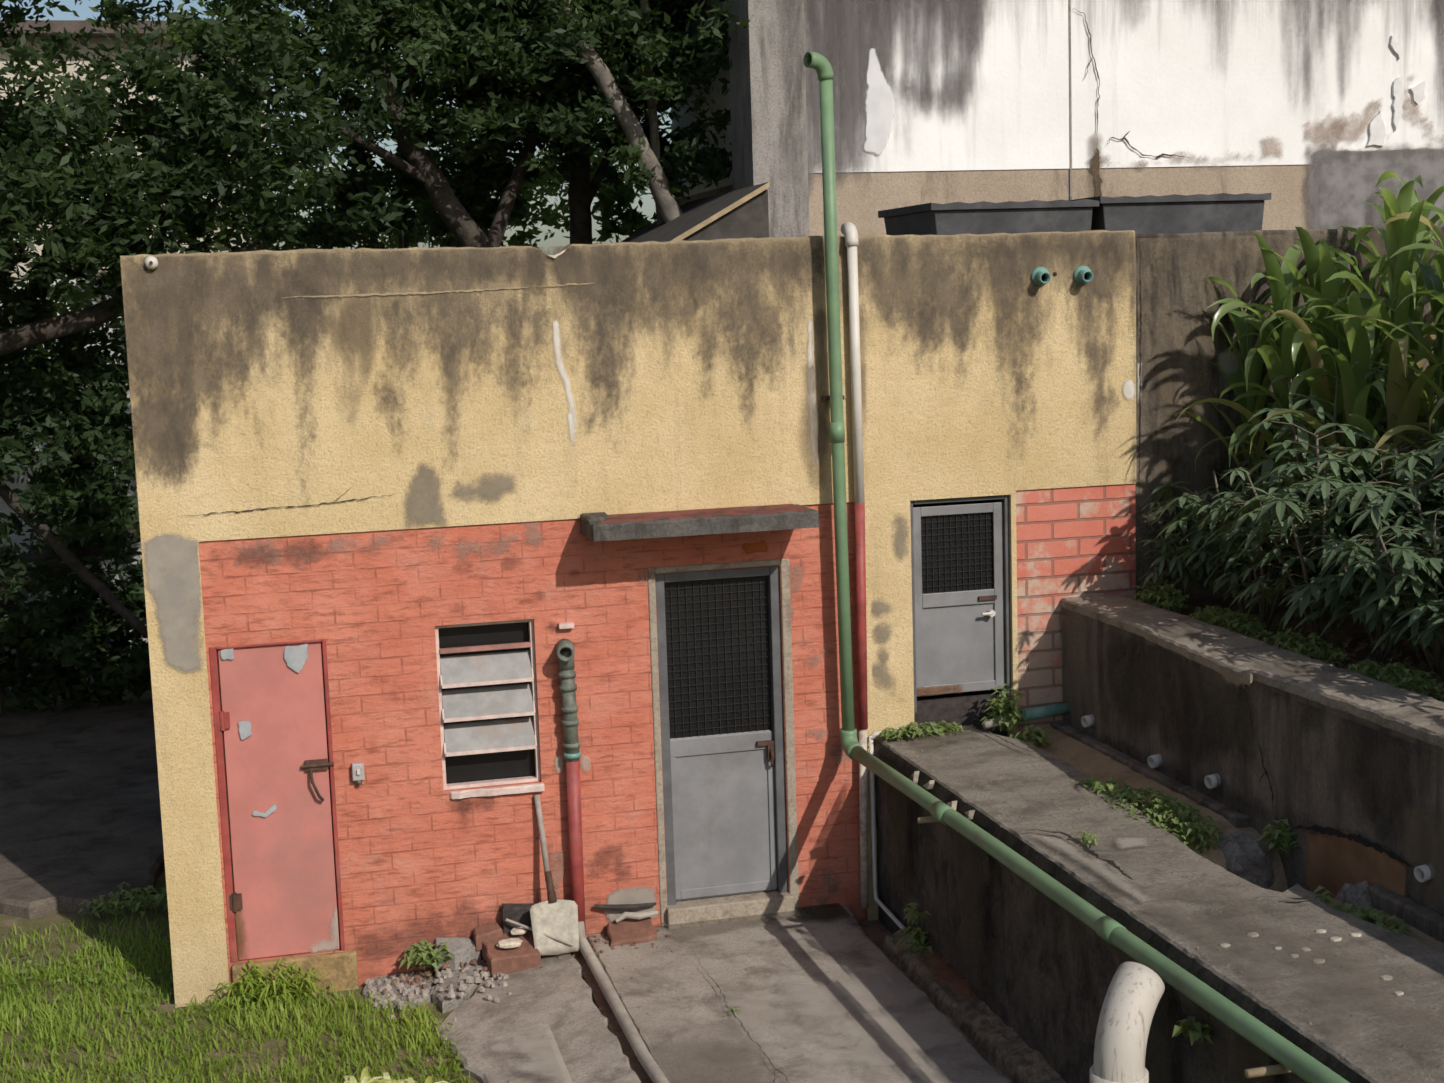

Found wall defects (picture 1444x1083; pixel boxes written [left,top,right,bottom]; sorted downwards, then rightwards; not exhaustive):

peeling [864,48,895,155]
leakage [804,0,983,183]
crack [1074,8,1189,197]
peeling [1306,77,1433,149]
leakage [1436,0,1444,84]
leakage [857,147,1386,459]
leakage [125,242,825,474]
crack [179,486,393,517]
peeling [221,648,234,660]
peeling [284,644,308,673]
peeling [238,721,252,740]
crack [695,954,790,1083]